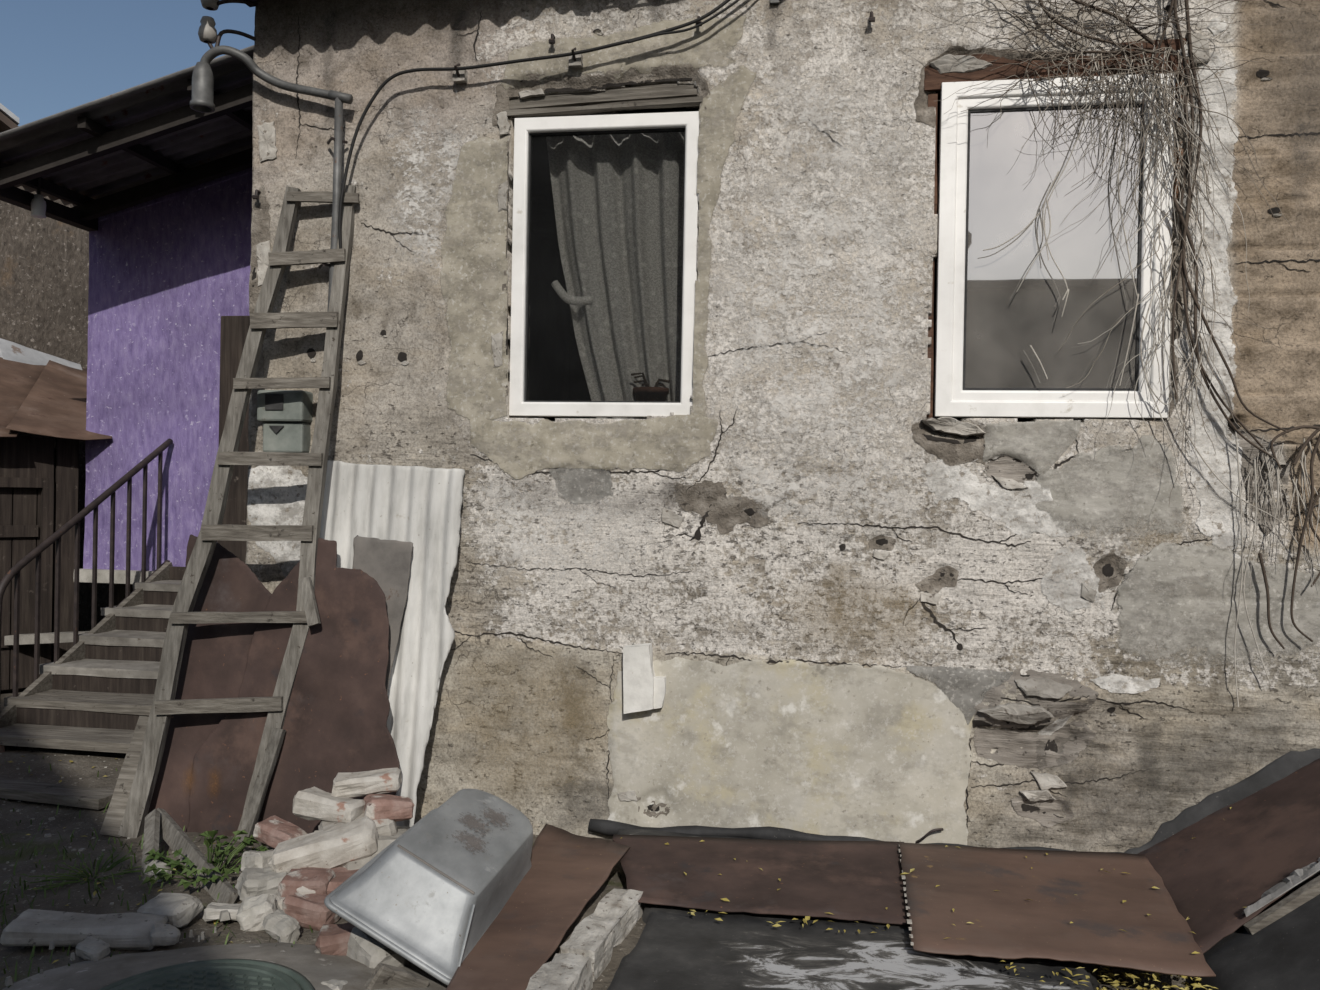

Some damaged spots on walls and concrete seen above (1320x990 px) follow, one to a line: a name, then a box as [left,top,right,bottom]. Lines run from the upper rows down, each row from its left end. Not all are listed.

spalling [914,45,1121,127]
crack [1236,259,1320,272]
crack [601,406,738,540]
crack [471,562,679,587]
crack [798,522,1033,547]
peeling [912,417,1127,614]
crack [903,539,1213,646]
crack [665,652,900,667]
spalling [972,668,1160,828]